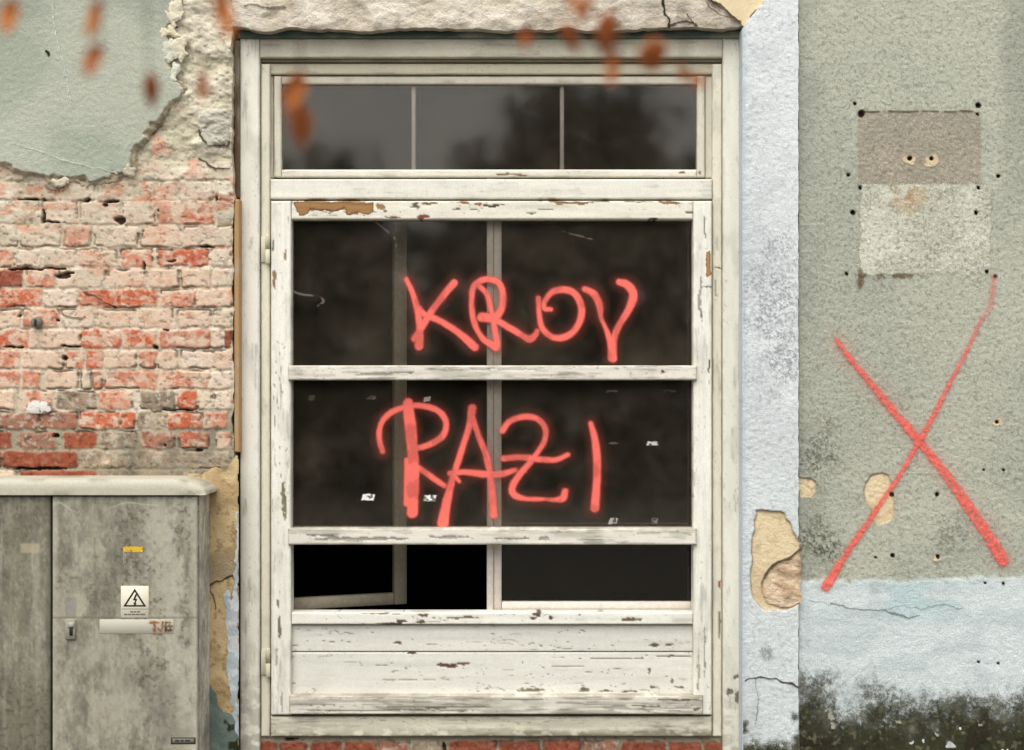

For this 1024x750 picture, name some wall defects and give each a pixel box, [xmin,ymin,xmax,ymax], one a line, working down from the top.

crack [661,0,741,29]
flaking render [0,0,189,190]
peeling [293,201,373,216]
flaking render [798,477,817,498]
flaking render [864,472,895,525]
flaking render [750,509,802,611]
flaking render [188,456,239,750]
crack [810,600,961,619]
water stain [743,668,1024,750]